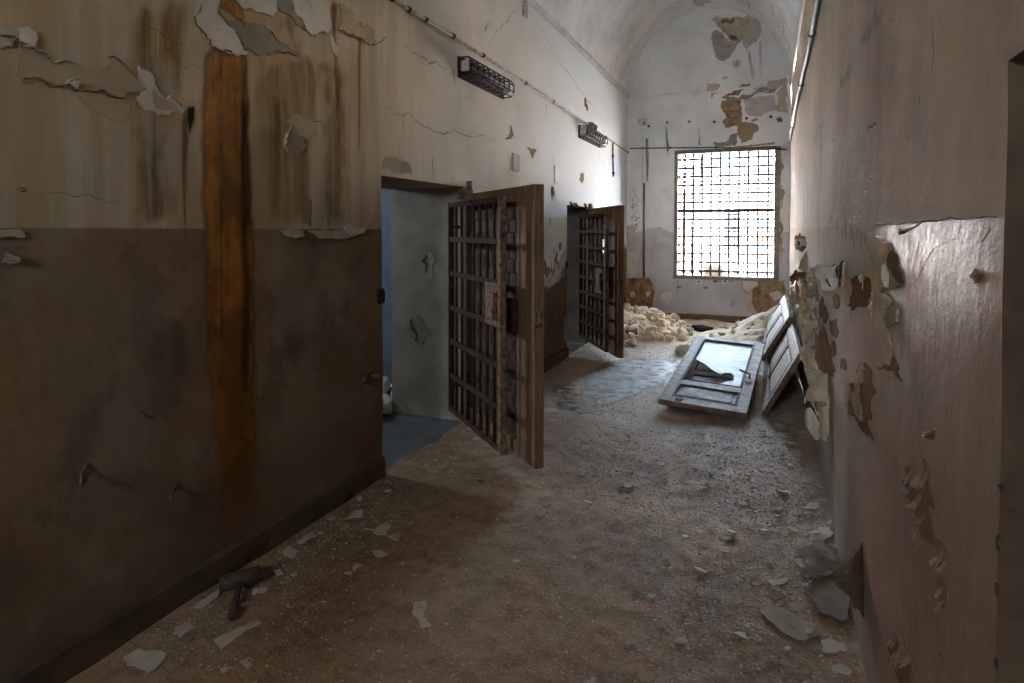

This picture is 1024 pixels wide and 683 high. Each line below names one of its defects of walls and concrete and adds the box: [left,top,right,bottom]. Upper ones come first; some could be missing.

peeling [0,23,185,123]
water stain [138,6,181,73]
peeling [194,0,332,56]
spalling [711,15,762,61]
water stain [327,75,344,213]
crack [385,100,487,139]
peeling [707,76,788,147]
rust [182,50,257,498]
peeling [544,242,566,289]
peeling [736,145,997,442]
peeling [898,458,950,574]